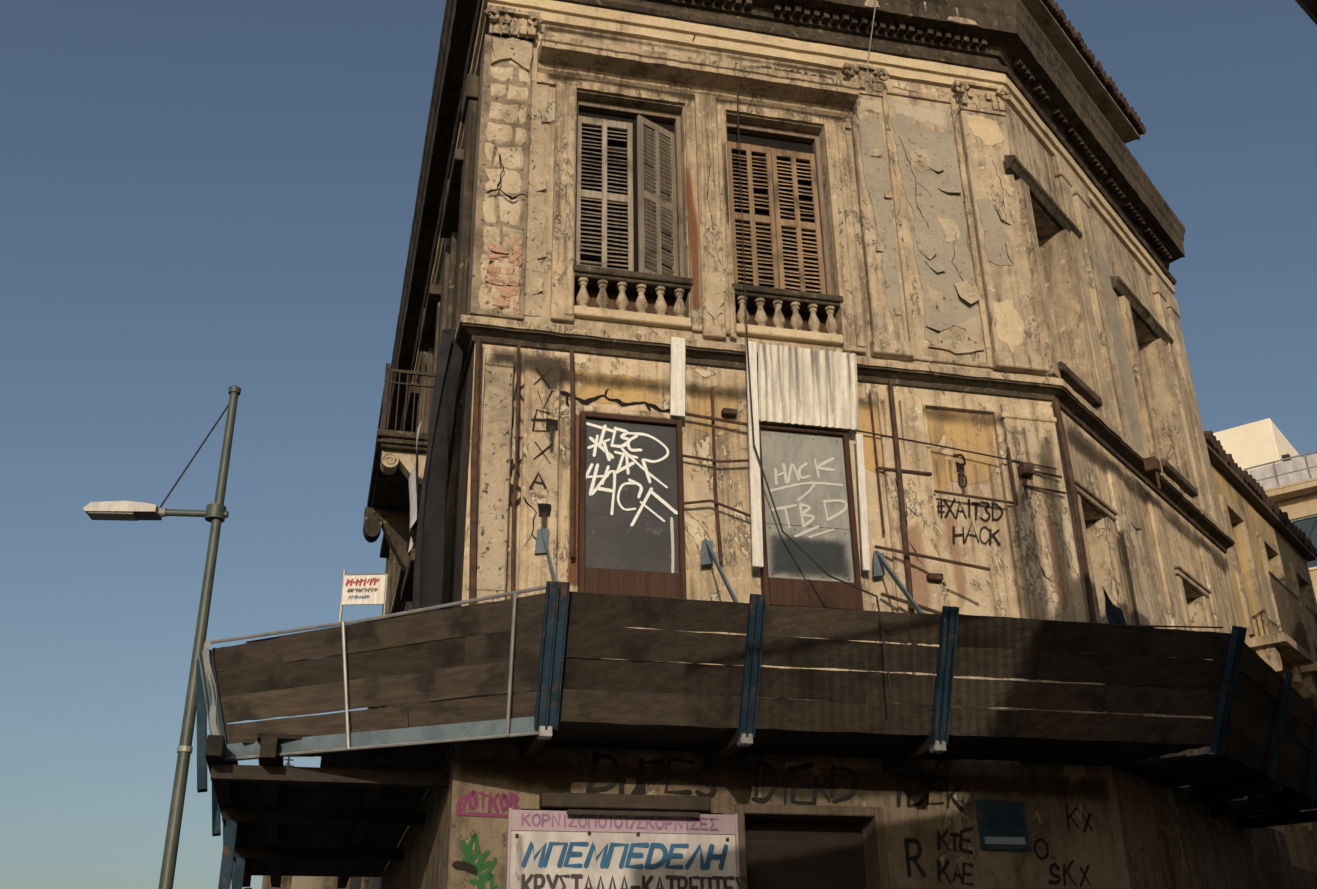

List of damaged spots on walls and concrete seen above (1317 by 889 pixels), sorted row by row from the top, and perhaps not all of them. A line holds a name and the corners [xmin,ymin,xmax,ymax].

peeling [485,37,550,317]
peeling [892,81,949,97]
peeling [858,98,1025,354]
crack [560,389,686,413]